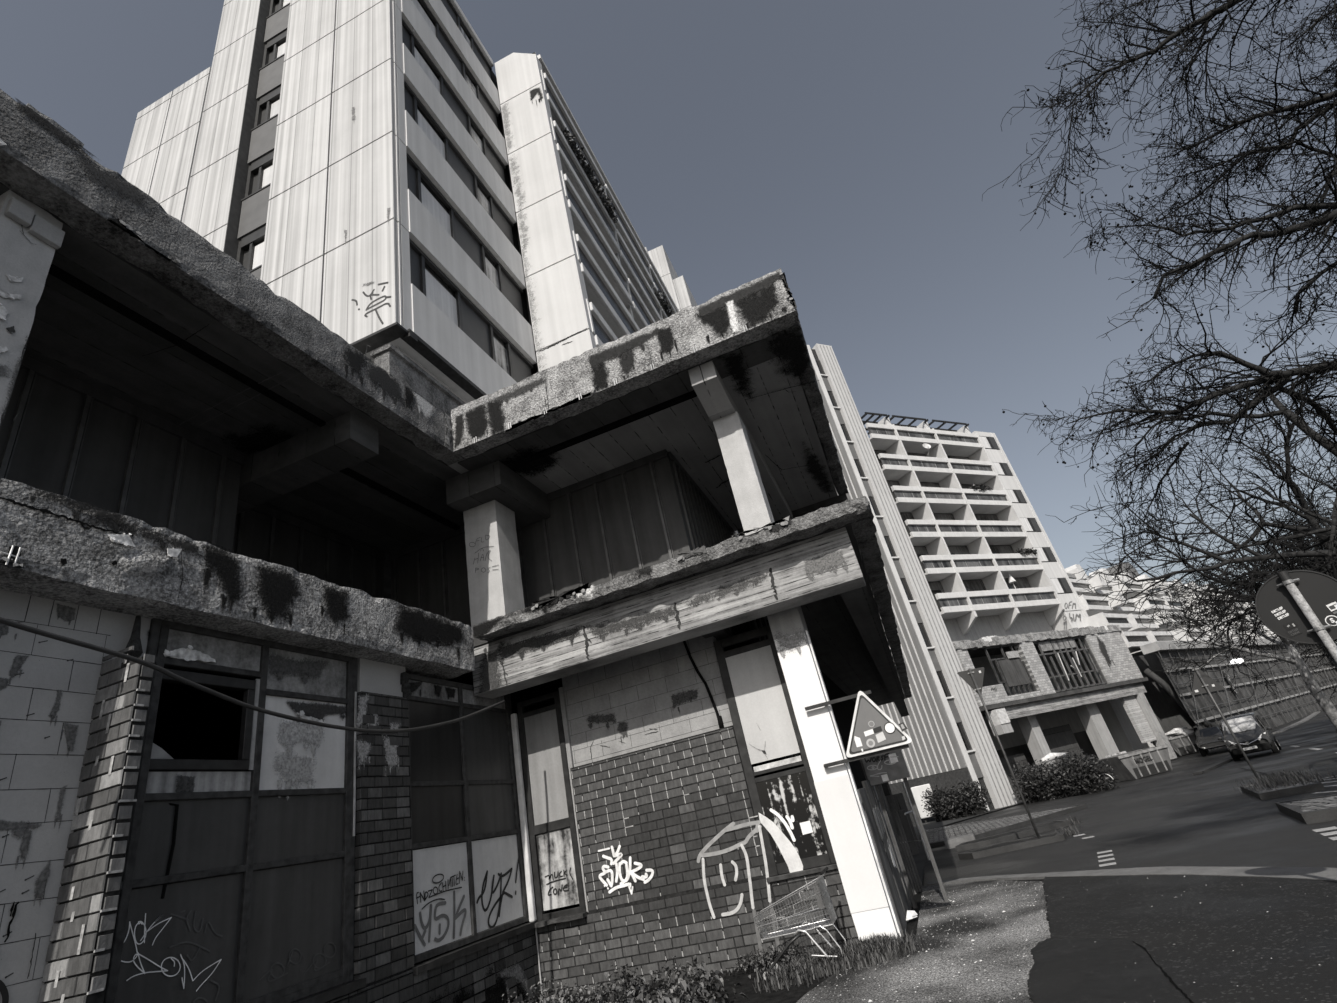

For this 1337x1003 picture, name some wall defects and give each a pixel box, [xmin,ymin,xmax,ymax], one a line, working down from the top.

peeling [0,274,24,353]
damp [622,340,678,379]
damp [718,350,753,399]
damp [706,300,812,386]
damp [204,570,235,615]
damp [253,607,293,627]
damp [69,886,85,955]